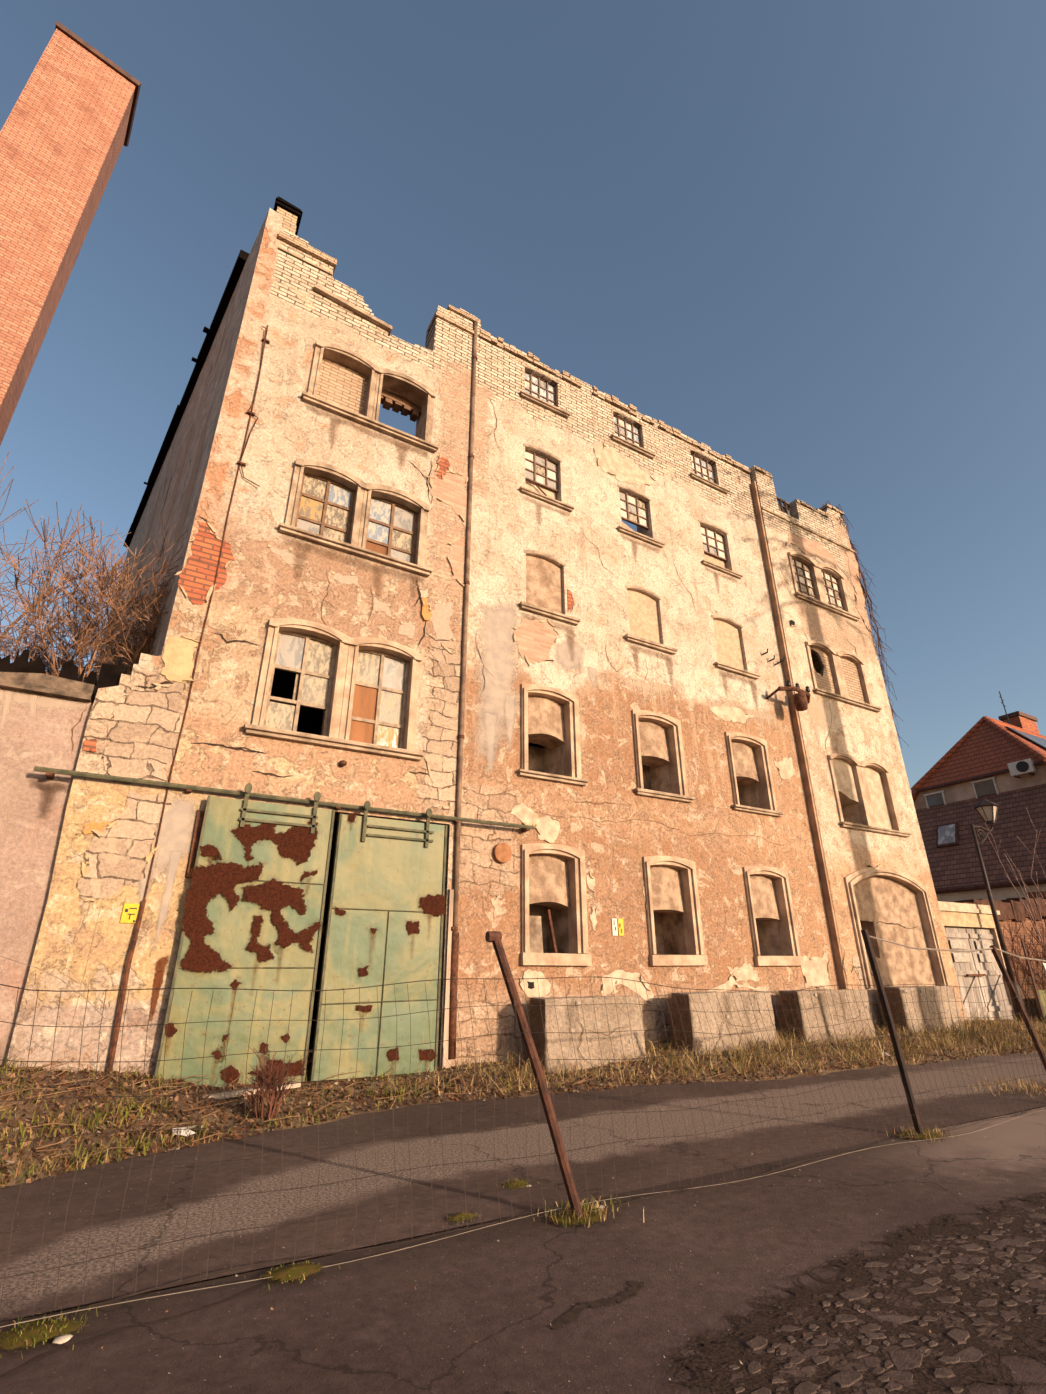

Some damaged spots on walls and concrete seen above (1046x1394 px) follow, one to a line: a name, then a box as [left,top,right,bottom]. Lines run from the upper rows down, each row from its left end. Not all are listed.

spalling [174,521,235,605]
spalling [513,618,560,666]
spalling [567,589,575,612]
spalling [74,676,191,902]
corrosion [149,820,346,1038]
corrosion [406,894,446,935]